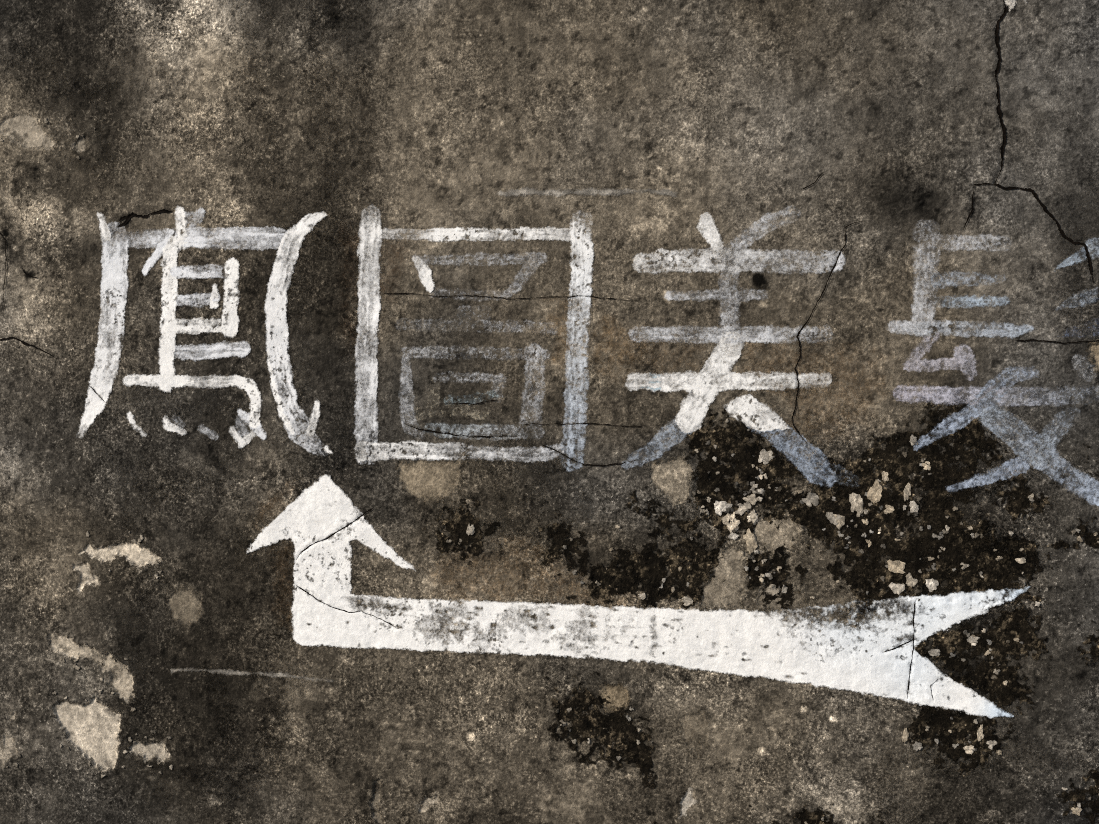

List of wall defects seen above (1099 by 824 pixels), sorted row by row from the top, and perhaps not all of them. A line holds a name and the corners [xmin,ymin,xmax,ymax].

crack [963,0,1094,282]
crack [0,233,57,359]
damp [0,0,377,488]
crack [1016,337,1099,345]
crack [297,507,374,558]
spalling [397,459,502,574]
crack [296,585,396,628]
peeling [538,390,1099,793]
spalling [49,633,173,778]
spalling [678,788,697,819]
peeling [772,803,839,824]